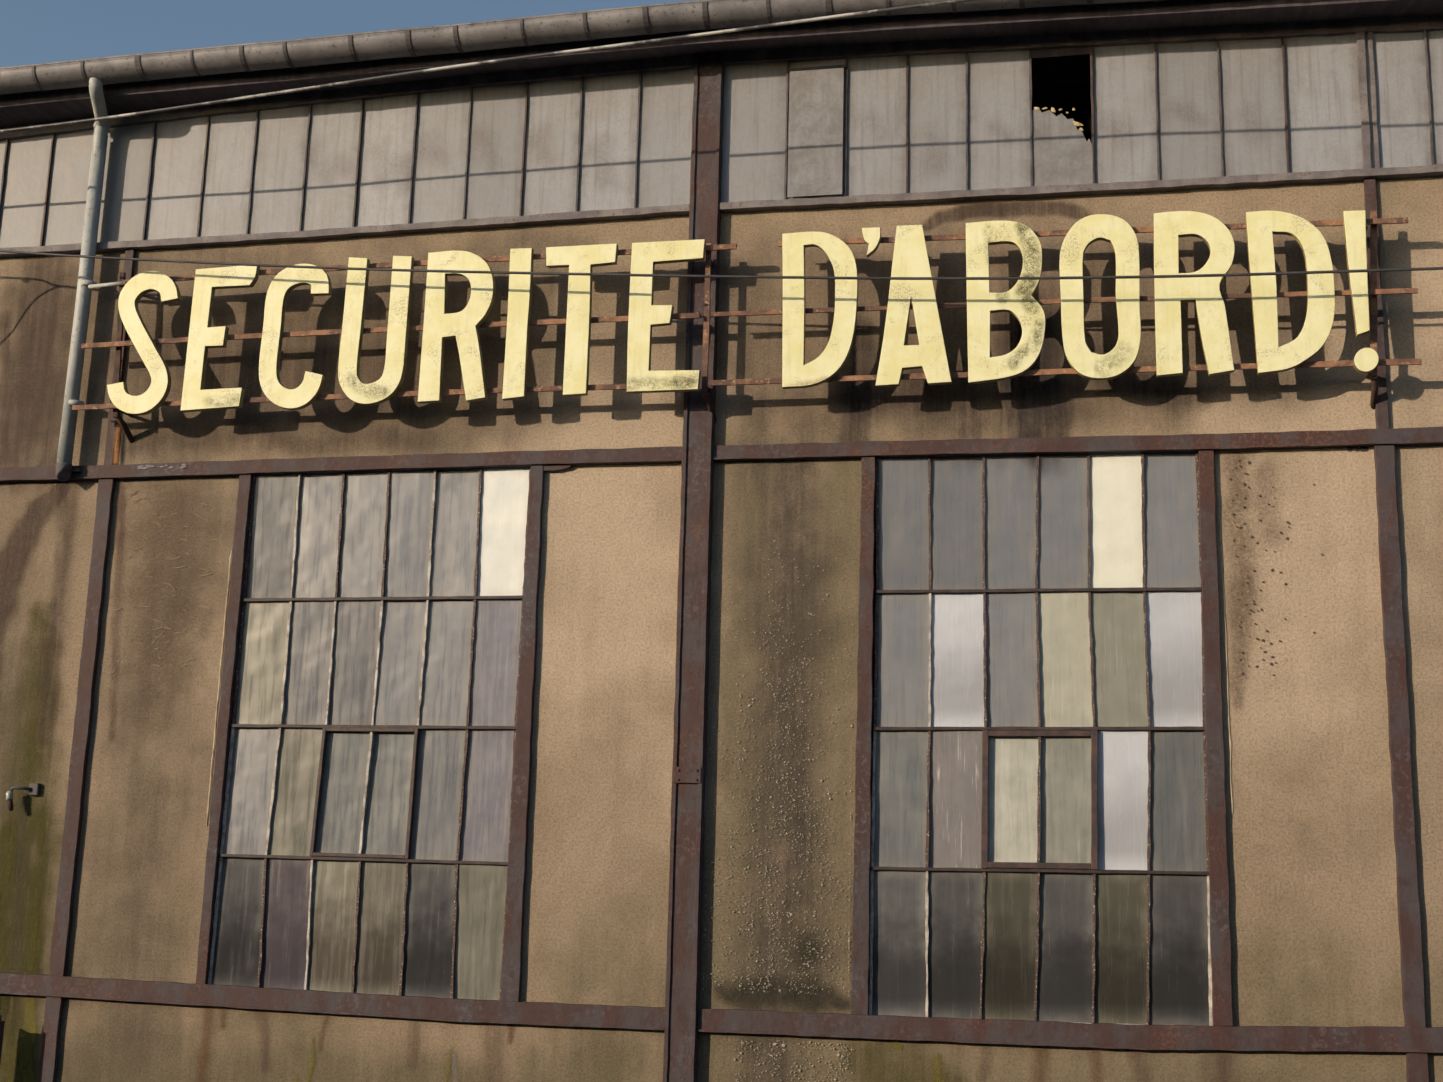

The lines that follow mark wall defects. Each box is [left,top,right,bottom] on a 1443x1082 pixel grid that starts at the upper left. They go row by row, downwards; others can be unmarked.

damp [0,257,68,629]
damp [703,478,853,1011]
damp [734,1039,854,1082]